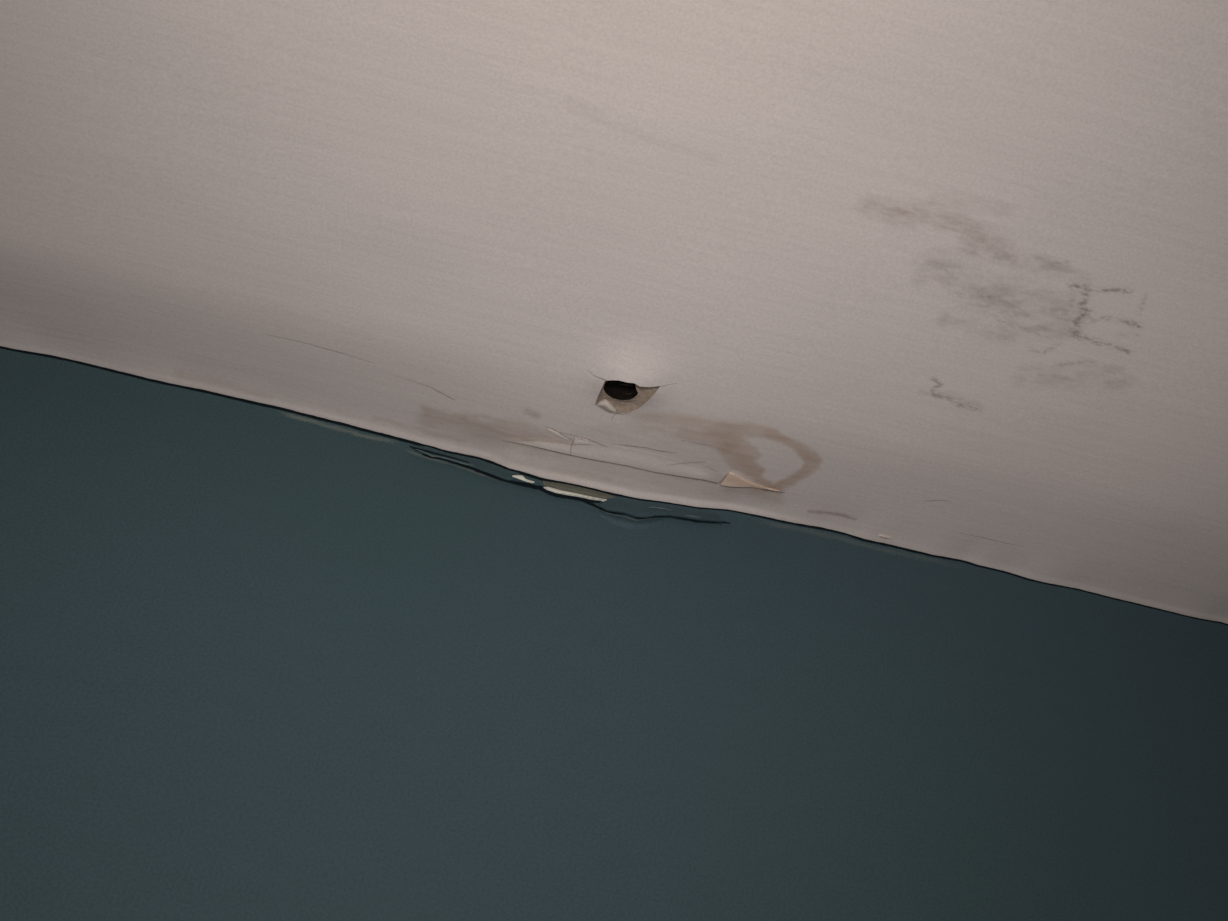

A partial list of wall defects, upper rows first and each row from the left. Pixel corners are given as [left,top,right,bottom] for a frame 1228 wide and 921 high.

hole [604,380,638,400]
peeling [409,445,729,525]